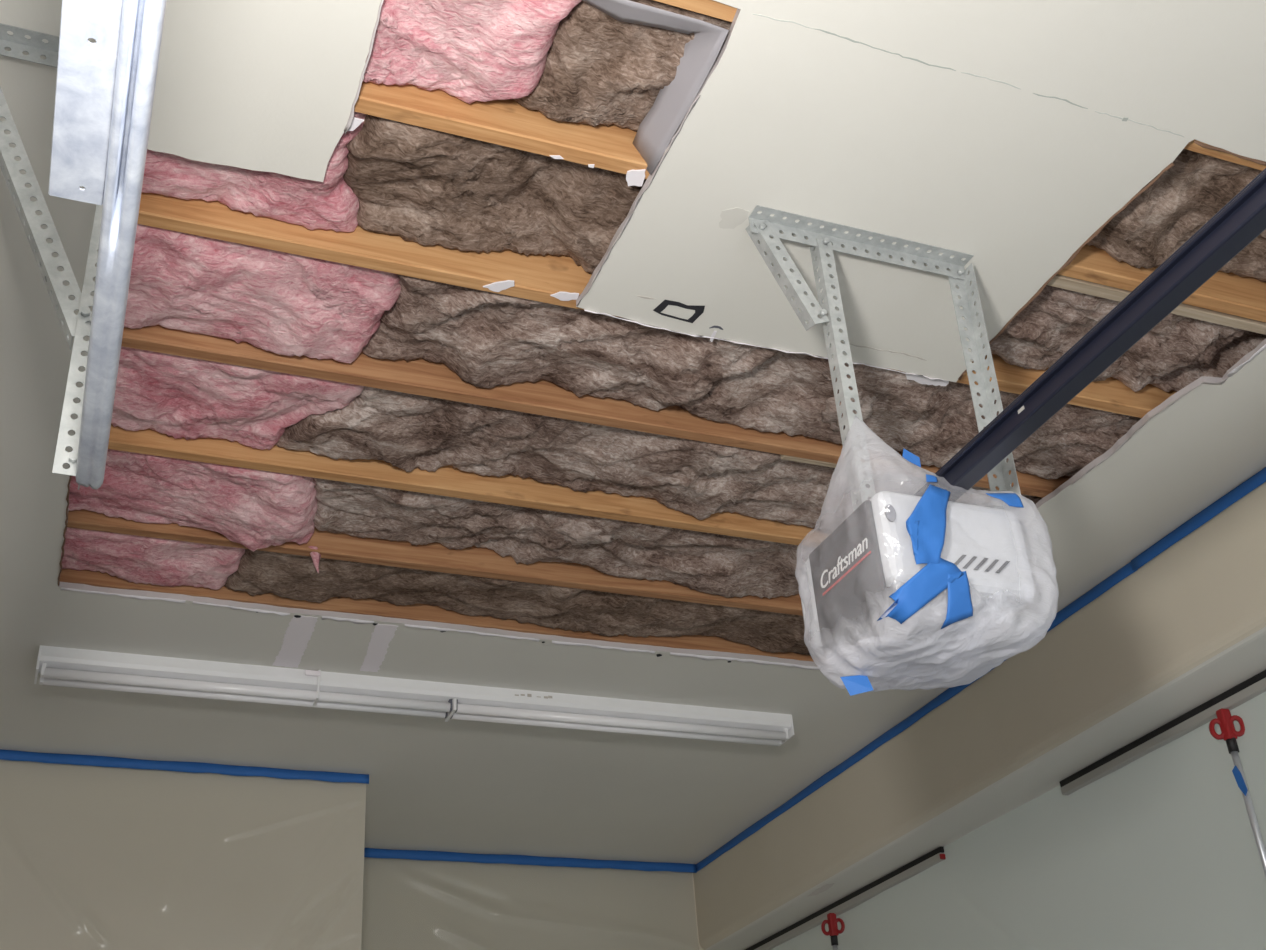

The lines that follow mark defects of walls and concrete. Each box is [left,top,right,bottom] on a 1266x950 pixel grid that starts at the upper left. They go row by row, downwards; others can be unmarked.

crack [753,14,1184,137]